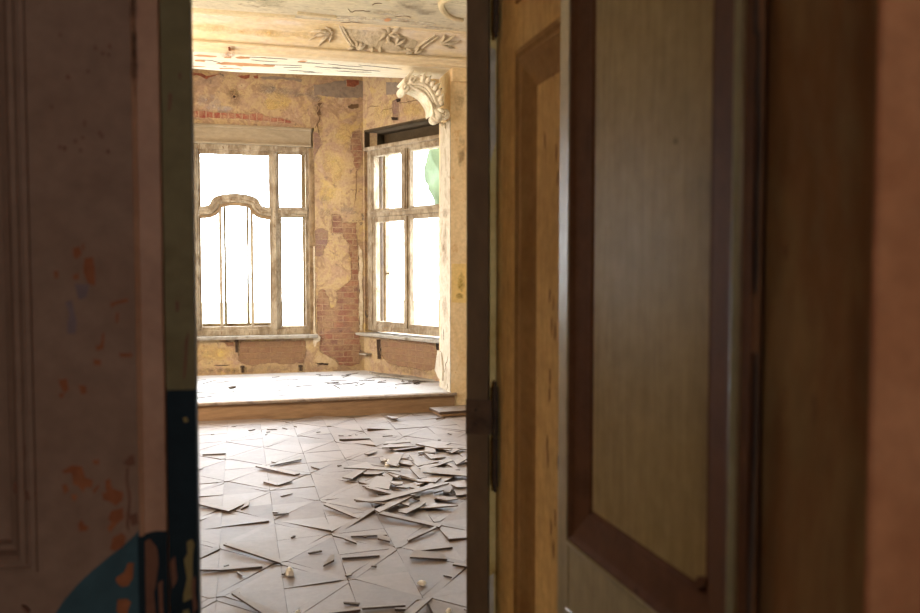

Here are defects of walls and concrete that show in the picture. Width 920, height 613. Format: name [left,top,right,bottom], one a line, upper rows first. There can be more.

flaking render [313,79,363,99]
flaking render [194,110,295,124]
flaking render [349,131,363,171]
flaking render [224,213,363,367]
flaking render [379,339,437,372]